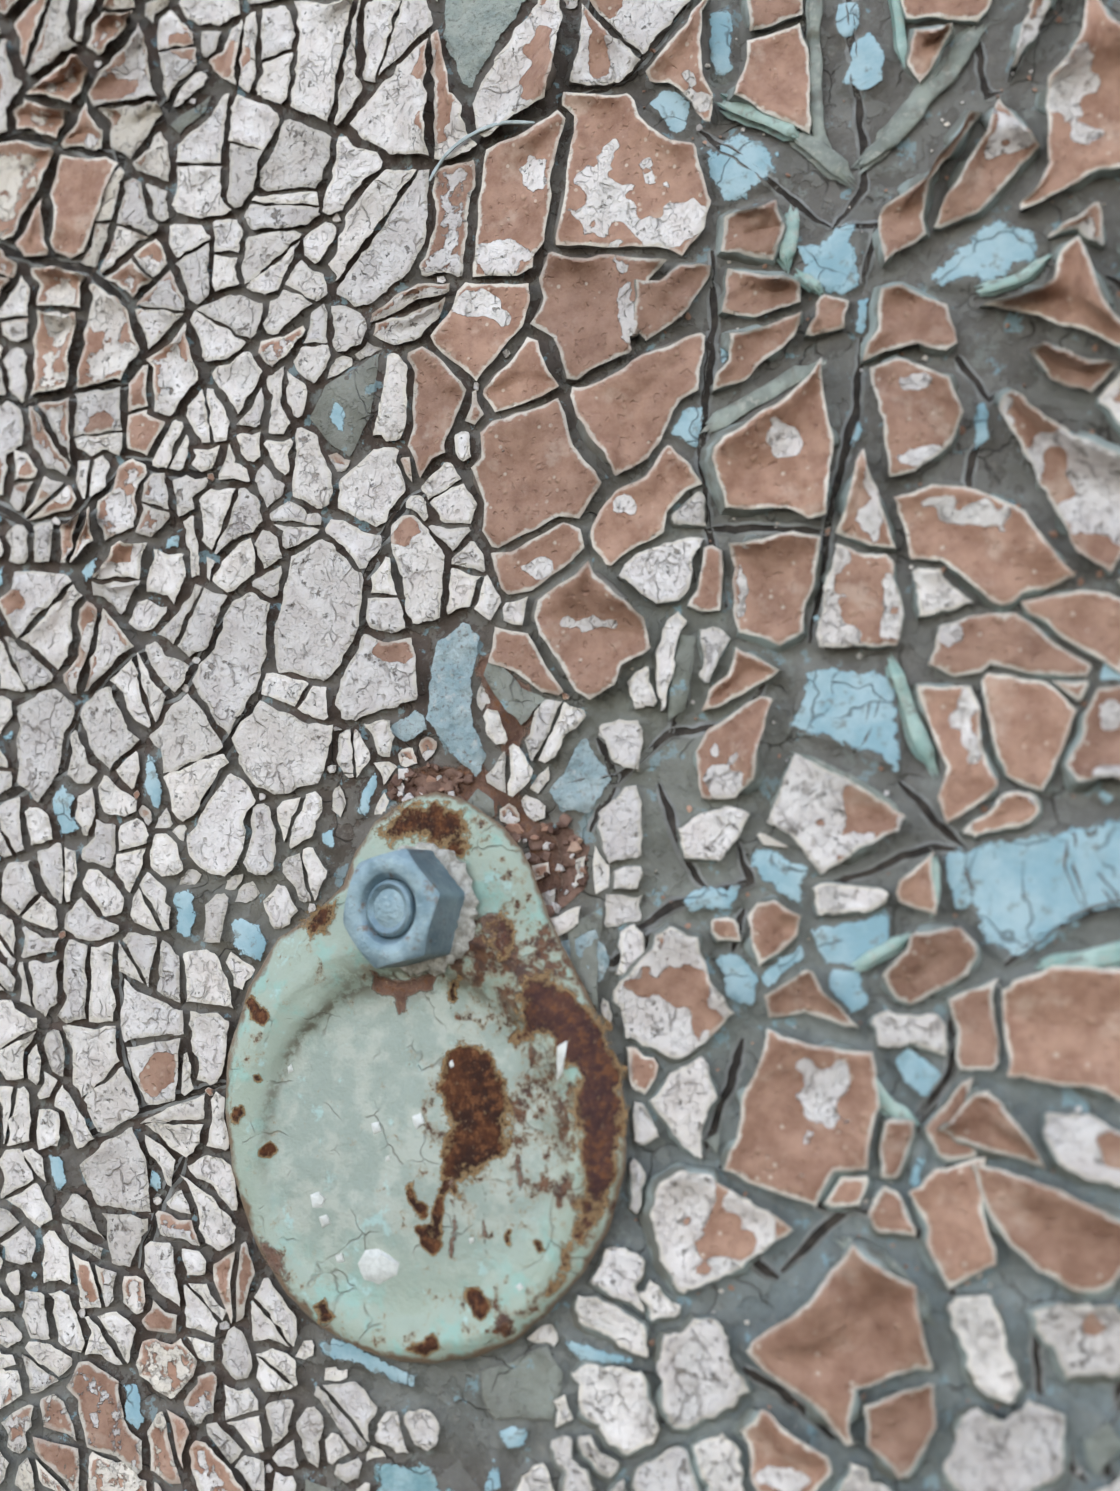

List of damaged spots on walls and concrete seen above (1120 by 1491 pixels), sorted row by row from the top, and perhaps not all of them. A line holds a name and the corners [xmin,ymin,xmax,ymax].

peeling [855,0,1120,476]
crack [0,456,236,537]
peeling [0,0,992,943]
crack [694,250,867,644]
crack [568,664,768,971]
crack [88,972,226,1138]
rust [369,970,463,1015]
rust [405,1040,523,1257]
rust [508,968,630,1301]
peeling [357,483,1120,1491]
peeling [296,1367,451,1491]
rust [463,1286,491,1321]